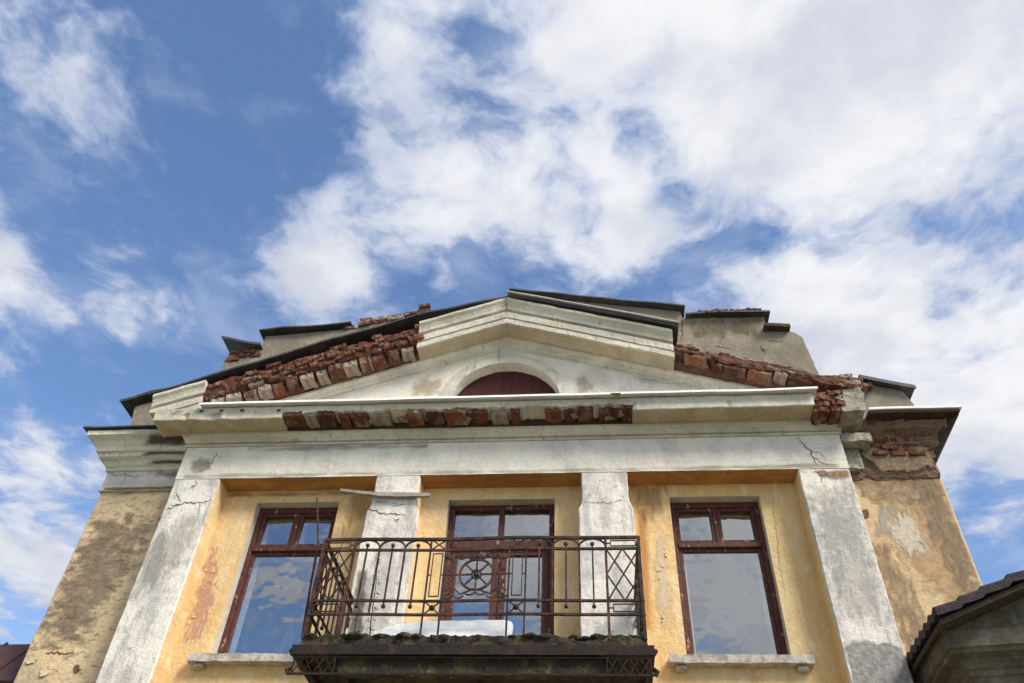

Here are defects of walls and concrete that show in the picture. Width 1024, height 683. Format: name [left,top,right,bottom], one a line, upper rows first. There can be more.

damp [104,435,210,490]
crack [167,453,217,510]
crack [798,438,837,482]
flaking render [854,438,974,601]
peeling [184,547,219,643]
spalling [14,657,51,683]